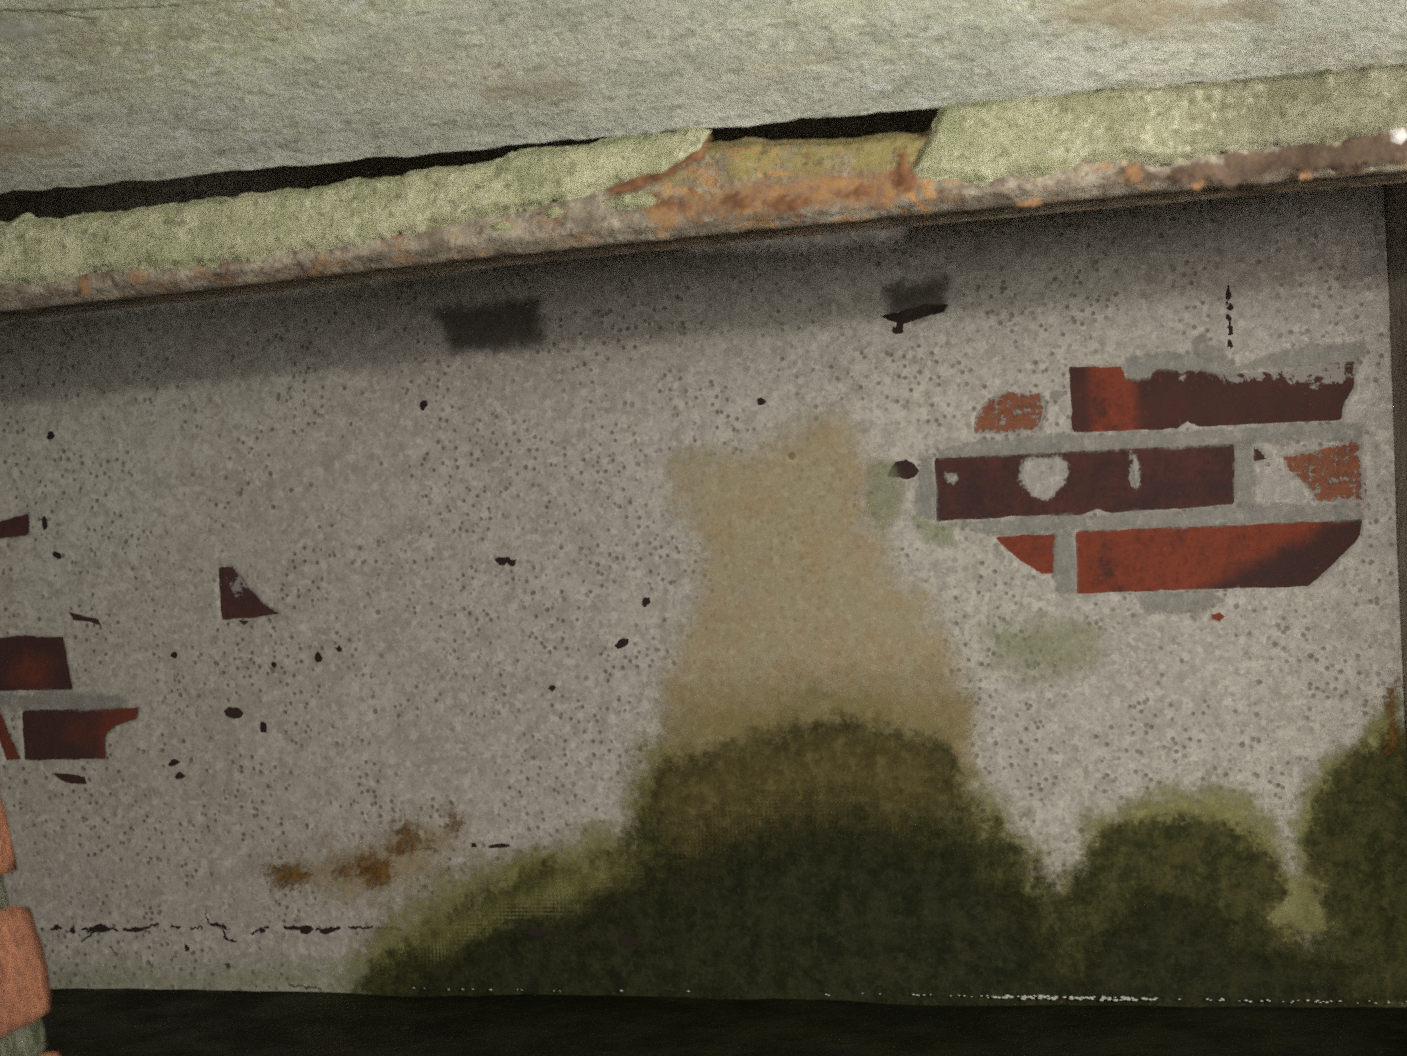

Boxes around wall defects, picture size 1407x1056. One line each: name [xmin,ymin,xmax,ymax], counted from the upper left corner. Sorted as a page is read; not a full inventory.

rust [1120,134,1407,189]
spalling [888,343,1367,622]
spalling [0,514,48,539]
spalling [69,612,101,626]
spalling [219,567,278,625]
damp [672,426,965,766]
spalling [0,636,138,784]
rust [267,864,311,890]
rust [332,822,437,889]
crack [41,914,403,969]